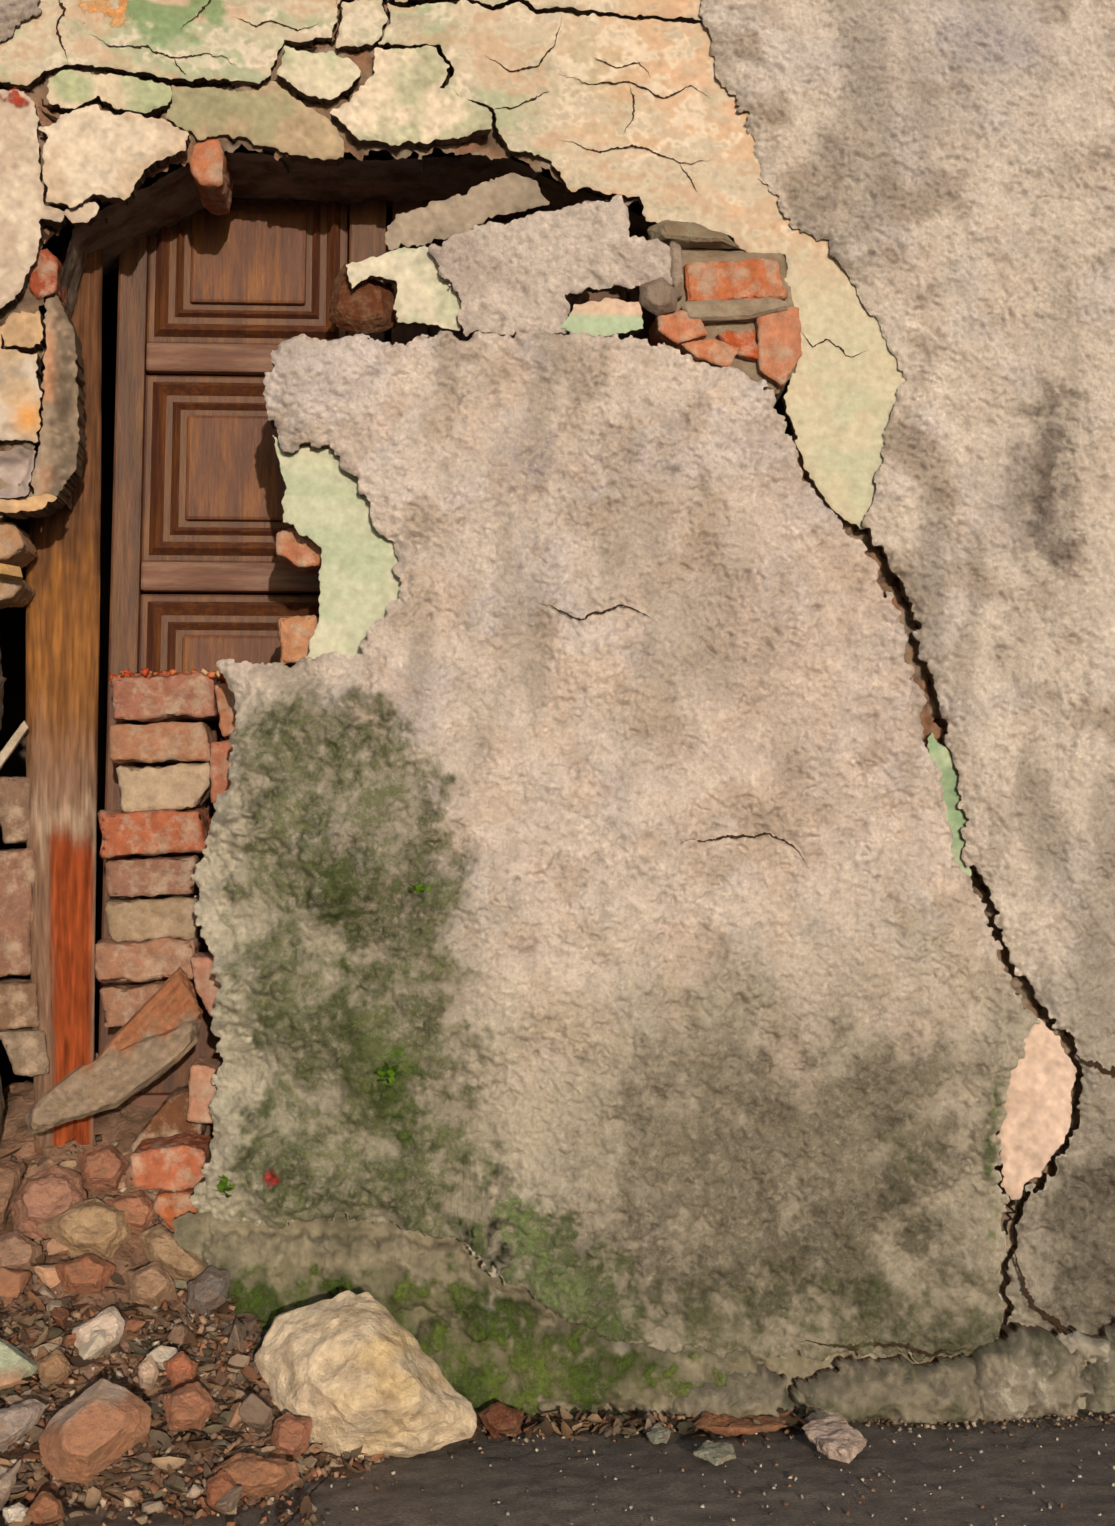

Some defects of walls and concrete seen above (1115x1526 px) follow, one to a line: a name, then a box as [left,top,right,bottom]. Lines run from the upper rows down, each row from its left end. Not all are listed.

crack [0,0,434,121]
crack [437,51,454,88]
crack [486,2,708,190]
peeling [0,0,906,531]
crack [803,334,865,357]
crack [773,386,794,436]
crack [854,528,919,629]
crack [974,872,996,913]
spalling [994,1018,1077,1200]
damp [611,1045,1004,1363]
crack [1006,1182,1076,1333]
crack [803,1340,967,1358]